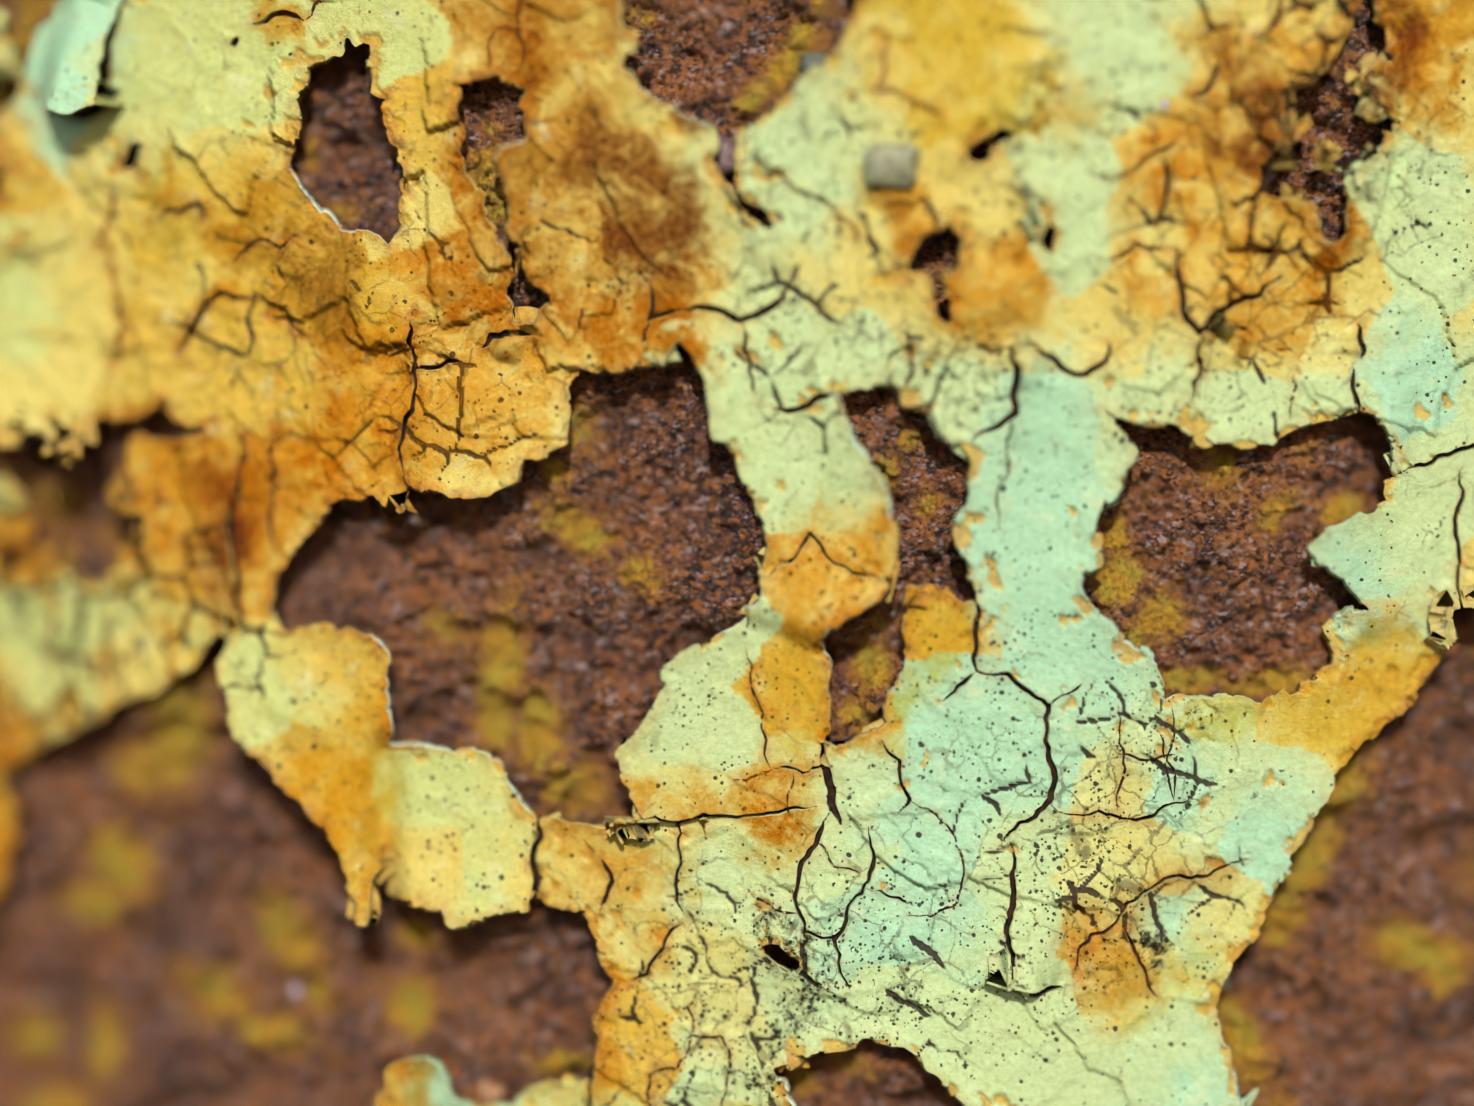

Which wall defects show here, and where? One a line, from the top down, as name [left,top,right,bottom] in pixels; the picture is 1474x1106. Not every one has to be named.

peeling [291,39,403,244]
peeling [622,0,856,149]
peeling [0,240,204,582]
crack [378,309,510,470]
crack [642,283,841,414]
crack [1108,241,1282,405]
peeling [0,309,977,1106]
crack [636,649,965,987]
crack [944,598,1248,997]
peeling [1010,295,1474,1106]
corrosion [477,1079,505,1106]
peeling [758,1012,1029,1106]